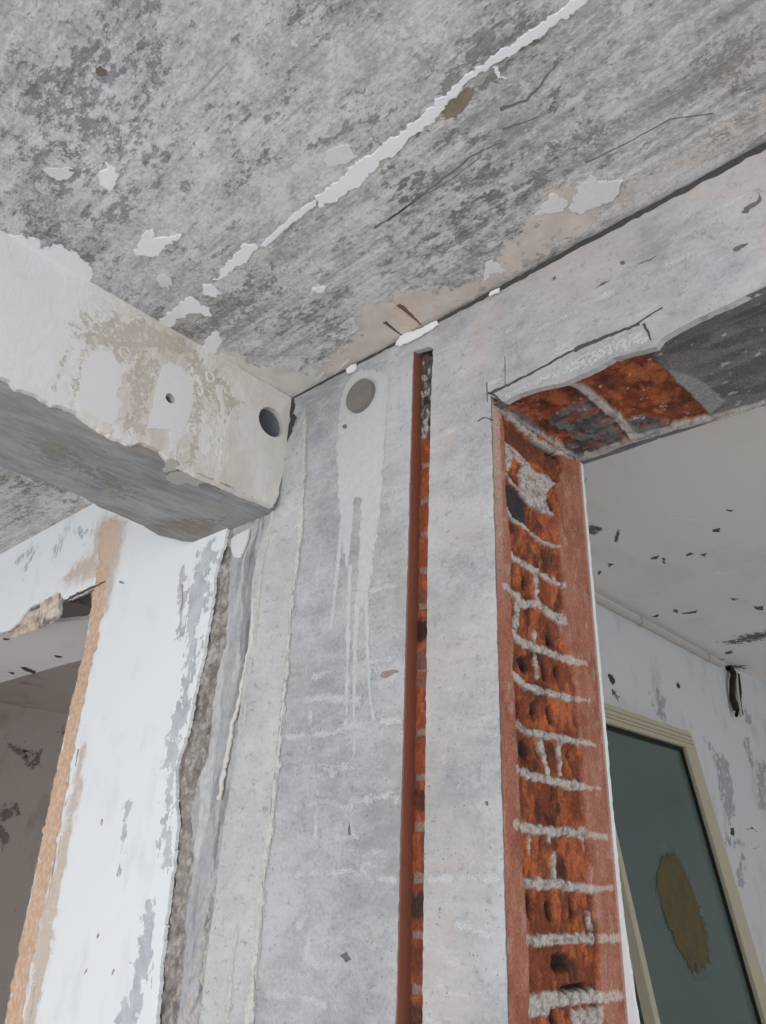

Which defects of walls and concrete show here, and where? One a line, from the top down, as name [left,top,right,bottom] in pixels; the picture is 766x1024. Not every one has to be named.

peeling [159,0,588,328]
crack [373,60,559,230]
crack [586,113,713,164]
peeling [9,233,94,281]
flaking render [504,330,654,399]
peeling [588,522,620,542]
spalling [3,594,64,640]
damp [224,359,406,1024]
spalling [114,458,271,1024]